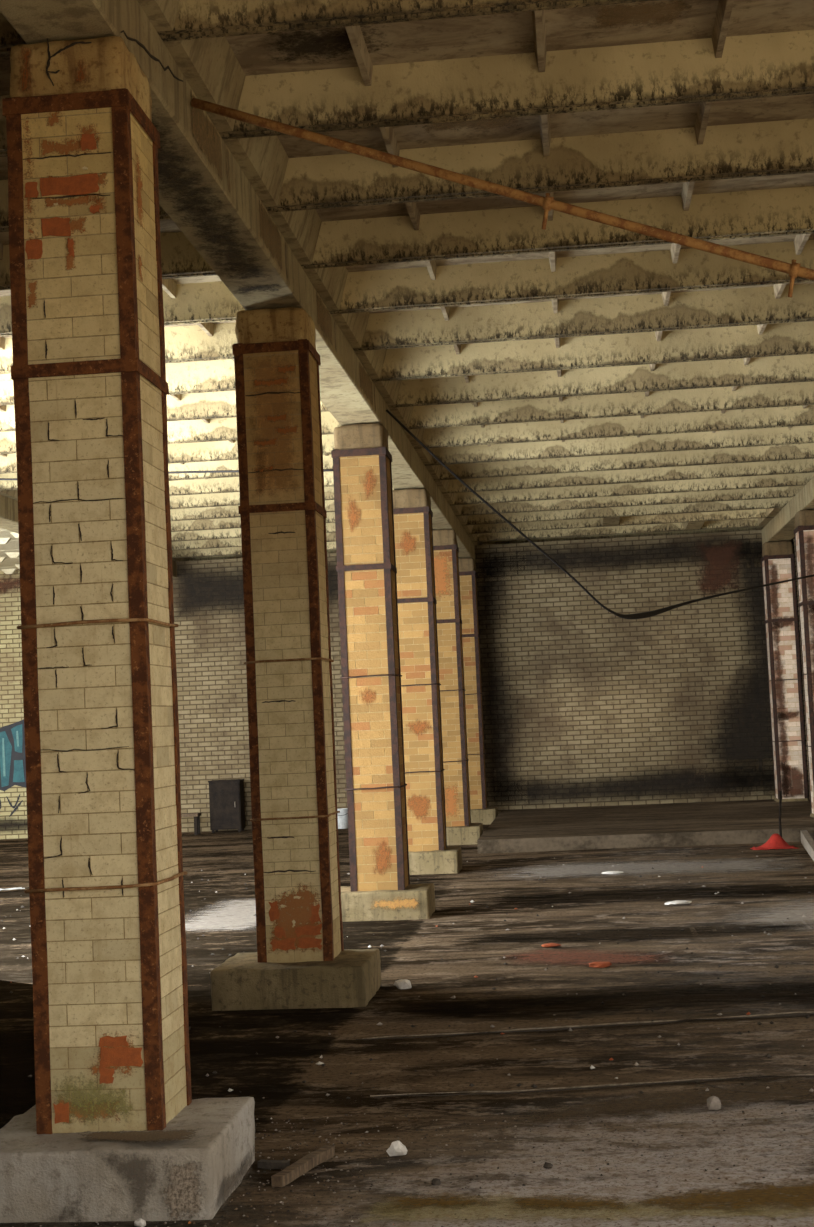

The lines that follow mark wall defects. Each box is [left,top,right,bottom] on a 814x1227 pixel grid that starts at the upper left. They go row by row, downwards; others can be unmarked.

crack [46,38,91,86]
crack [120,30,183,82]
peeling [24,111,107,309]
water stain [152,91,288,293]
peeling [269,885,322,953]
peeling [91,1033,143,1084]
peeling [53,1099,120,1124]